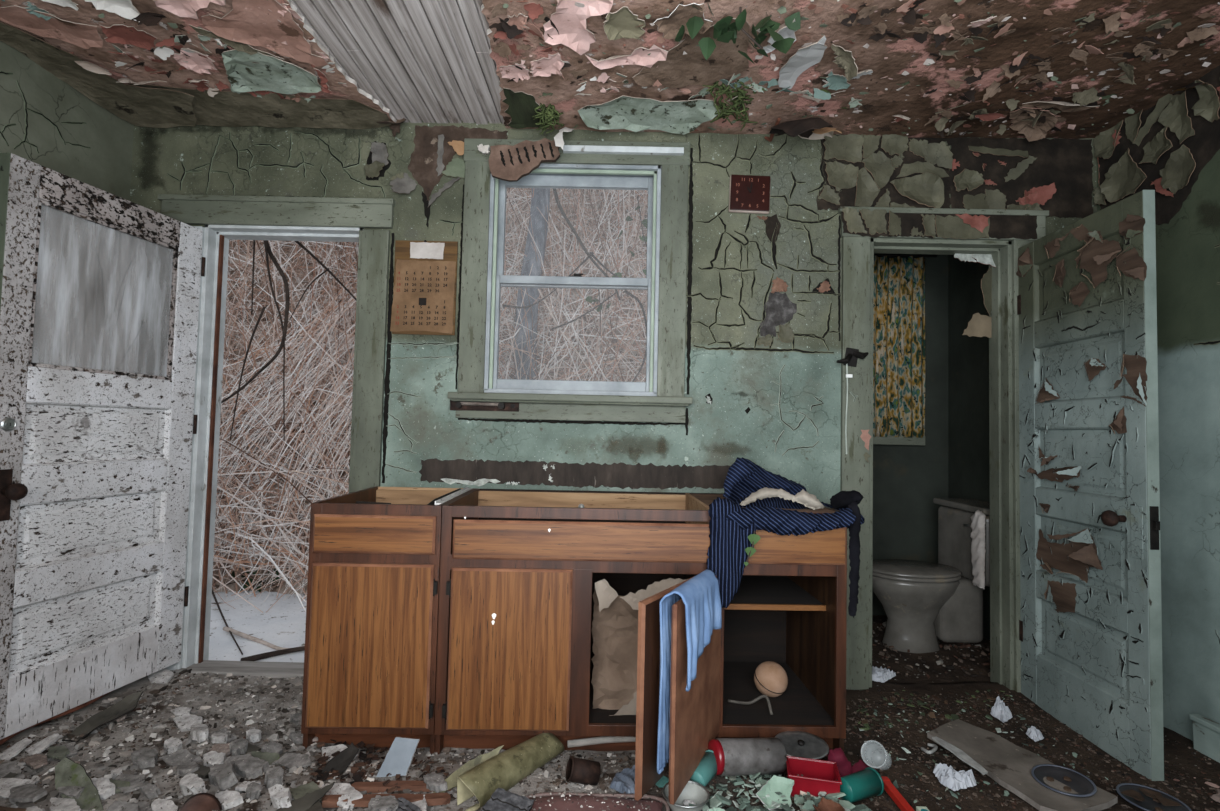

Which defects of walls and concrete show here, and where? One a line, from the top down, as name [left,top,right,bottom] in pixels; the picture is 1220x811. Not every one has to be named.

crack [0,71,90,154]
crack [167,131,386,198]
peeling [0,0,1220,346]
crack [458,133,849,456]
crack [1194,338,1220,346]